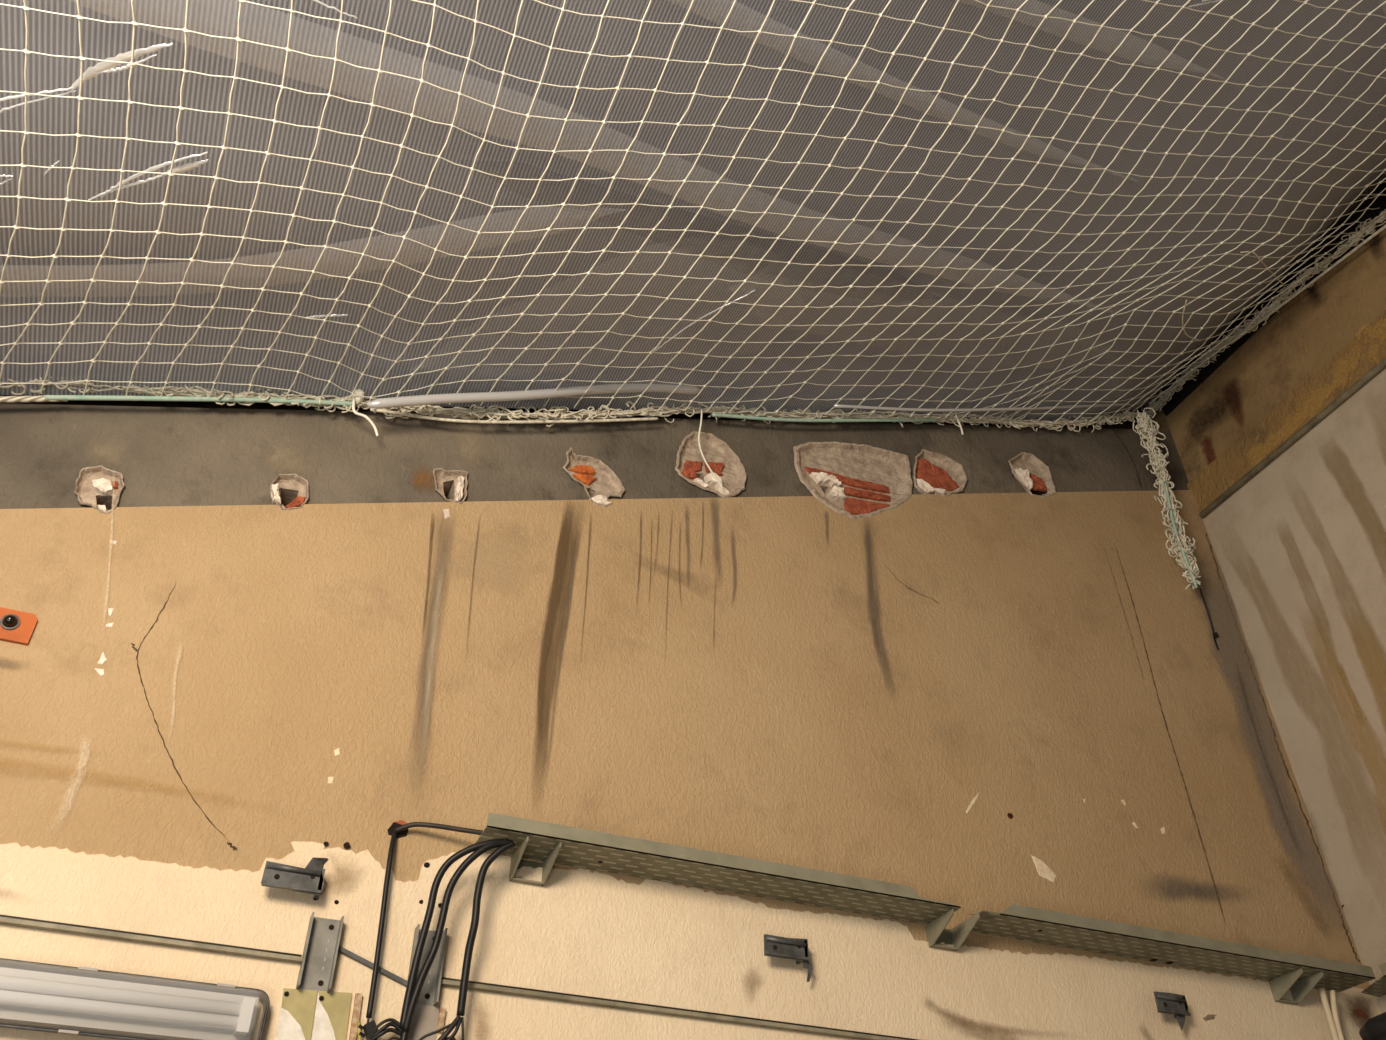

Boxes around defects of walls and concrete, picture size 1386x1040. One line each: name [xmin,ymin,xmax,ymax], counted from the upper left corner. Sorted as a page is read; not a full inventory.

spalling [74,465,125,515]
spalling [270,474,309,510]
spalling [563,447,625,507]
spalling [675,431,747,498]
spalling [793,442,967,519]
spalling [1008,452,1056,498]
leakage [638,503,736,596]
leakage [421,524,446,721]
leakage [537,521,591,754]
leakage [866,534,887,669]
crack [131,586,237,850]
leakage [1197,583,1333,897]